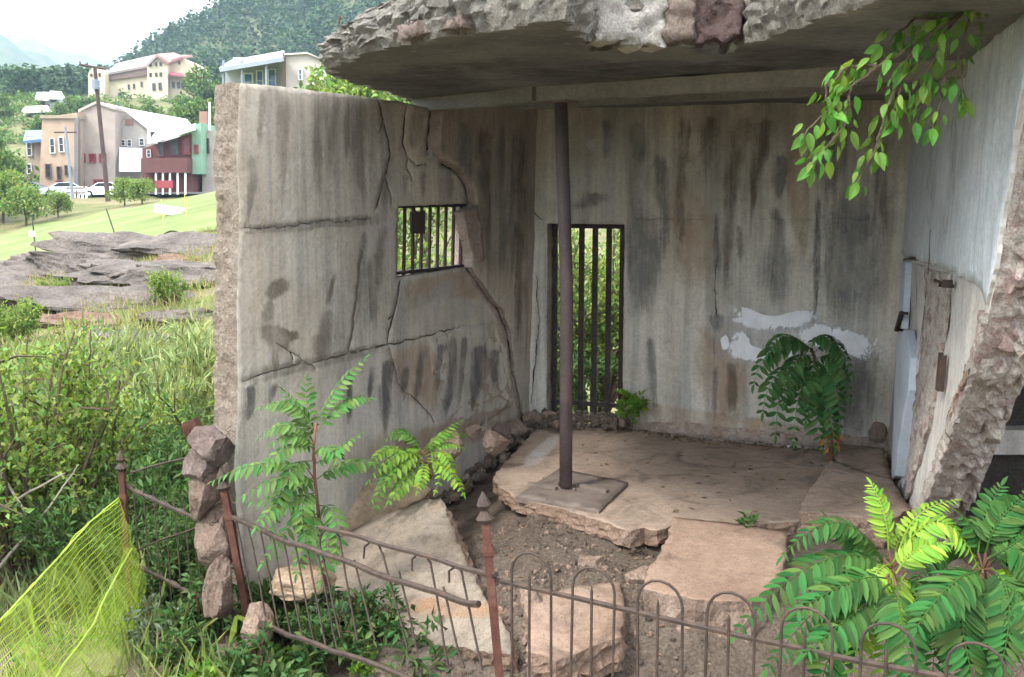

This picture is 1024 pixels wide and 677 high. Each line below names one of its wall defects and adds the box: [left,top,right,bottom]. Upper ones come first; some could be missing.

spalling [396,14,476,42]
spalling [585,0,746,54]
crack [376,103,469,209]
water stain [750,121,787,212]
water stain [817,121,847,151]
water stain [247,386,255,415]
water stain [368,353,424,429]
crack [386,281,434,422]
water stain [436,339,499,412]
crack [465,268,540,421]
crack [712,217,720,381]
spalling [903,268,989,523]